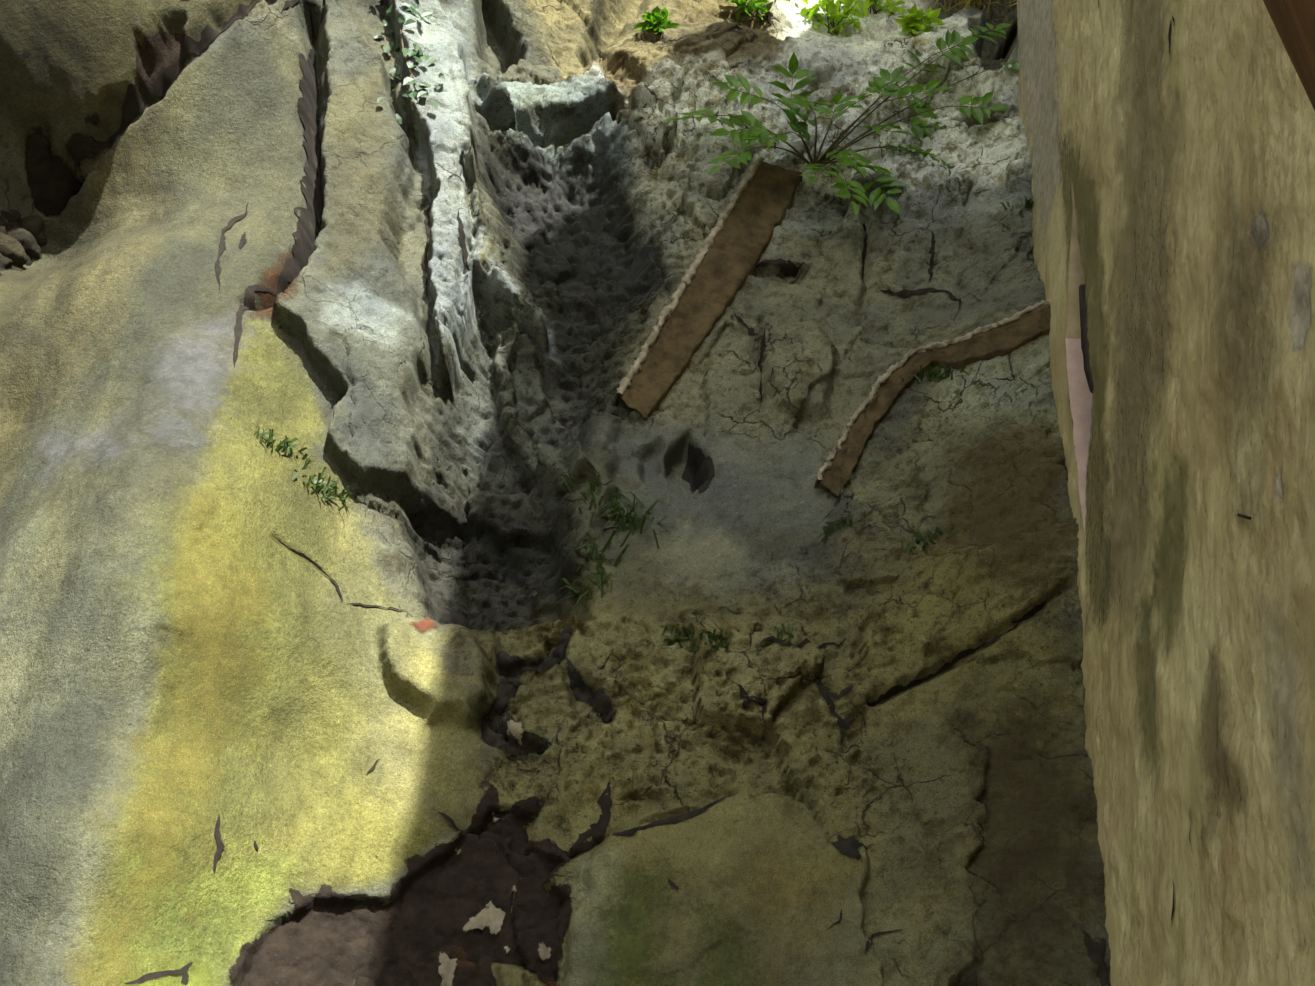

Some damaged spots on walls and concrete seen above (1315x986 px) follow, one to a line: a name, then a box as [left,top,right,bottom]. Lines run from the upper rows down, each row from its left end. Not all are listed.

spalling [25,126,99,217]
crack [74,0,324,367]
crack [272,534,404,611]
spalling [480,628,617,757]
crack [759,593,1059,745]
peeling [229,783,573,986]